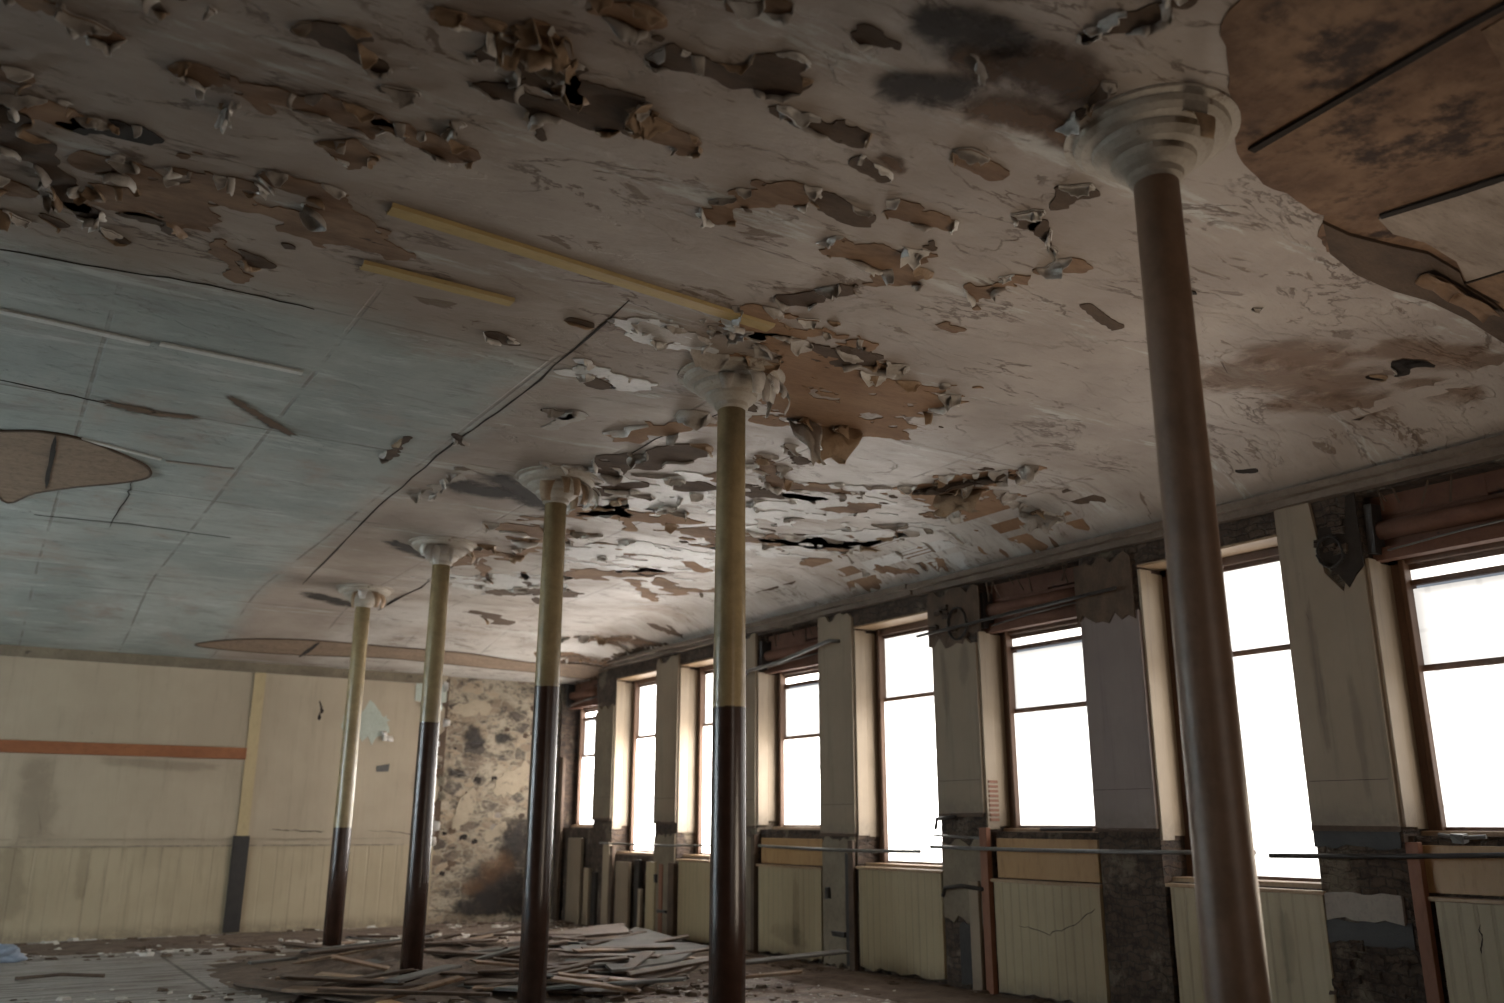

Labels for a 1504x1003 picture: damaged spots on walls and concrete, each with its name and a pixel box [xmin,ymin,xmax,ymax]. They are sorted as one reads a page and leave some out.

peeling [1076,0,1198,46]
peeling [167,20,481,170]
peeling [429,6,703,159]
peeling [0,64,416,284]
peeling [539,0,1106,649]
peeling [1079,303,1124,331]
peeling [1365,358,1435,382]
peeling [449,516,544,625]
peeling [560,623,683,664]
leakage [447,767,465,777]
leakage [464,726,511,749]
leakage [454,819,527,916]